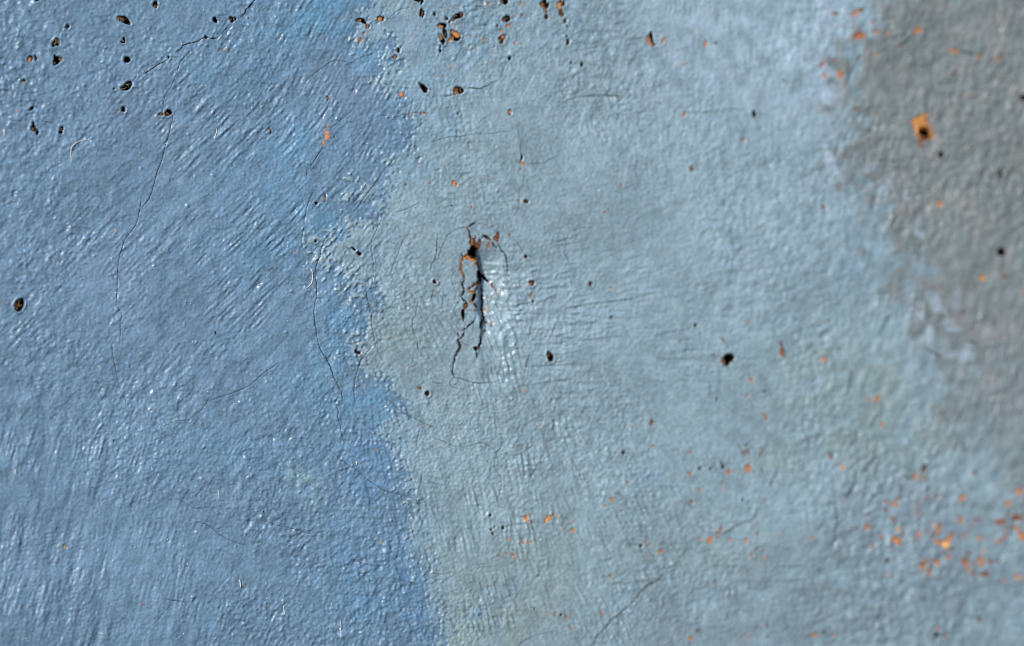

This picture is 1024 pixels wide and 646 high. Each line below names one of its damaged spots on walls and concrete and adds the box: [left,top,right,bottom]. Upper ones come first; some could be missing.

crack [112,0,255,404]
crack [302,148,443,531]
crack [388,65,631,493]